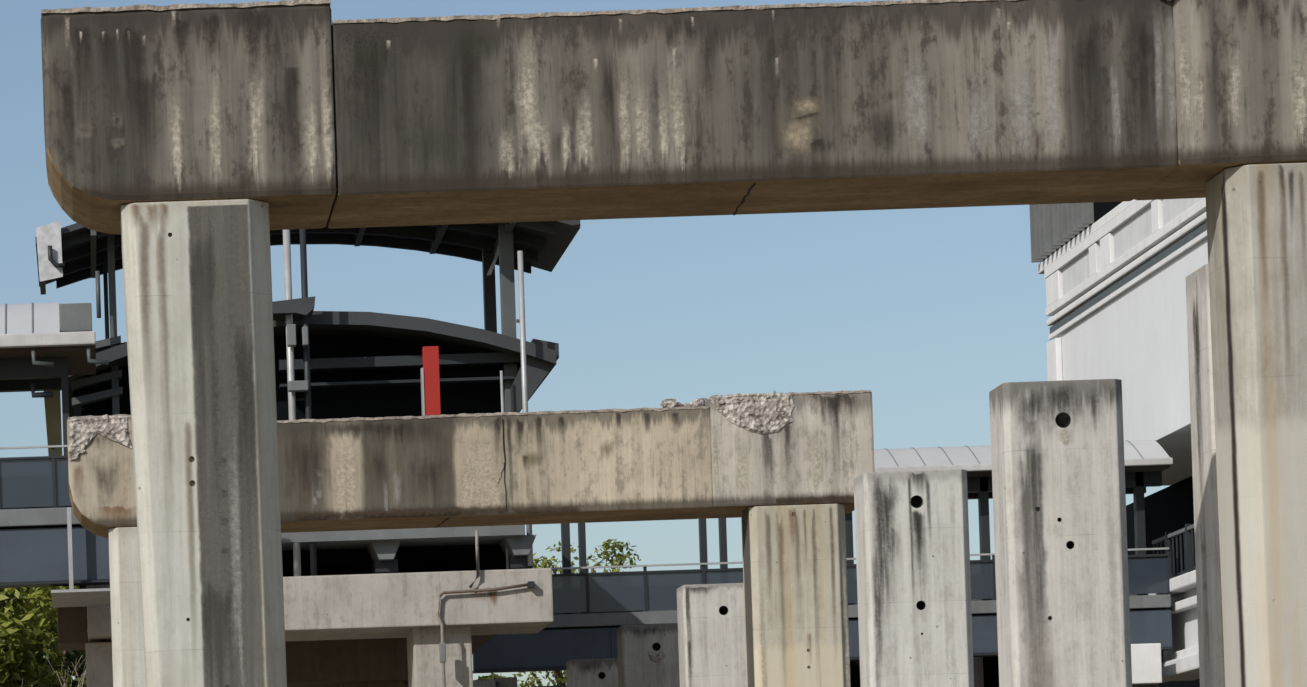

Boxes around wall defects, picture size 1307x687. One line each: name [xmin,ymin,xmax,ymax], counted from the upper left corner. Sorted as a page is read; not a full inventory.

water stain [173,110,182,182]
water stain [308,98,331,175]
water stain [520,68,547,166]
water stain [563,112,590,167]
water stain [608,87,684,164]
crack [733,183,756,215]
spalling [68,415,132,461]
water stain [187,205,264,687]
water stain [296,426,577,519]
spalling [707,393,794,435]
water stain [776,442,854,516]
water stain [908,474,930,567]